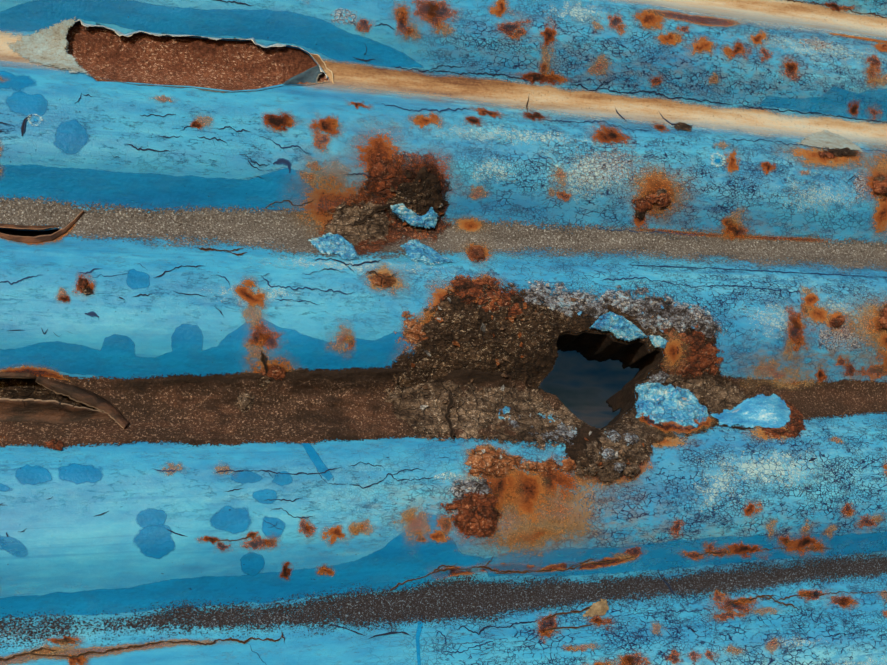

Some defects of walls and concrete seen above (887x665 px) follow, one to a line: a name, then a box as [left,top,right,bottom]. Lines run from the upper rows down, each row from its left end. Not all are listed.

corrosion [394,0,457,40]
corrosion [633,0,887,87]
corrosion [65,22,887,242]
corrosion [292,128,483,265]
peeling [590,312,669,349]
corrosion [720,286,887,420]
corrosion [0,274,653,562]
spalling [498,406,602,474]
peeling [635,371,709,428]
crack [682,547,834,558]
crack [0,630,285,665]
crack [435,572,887,655]